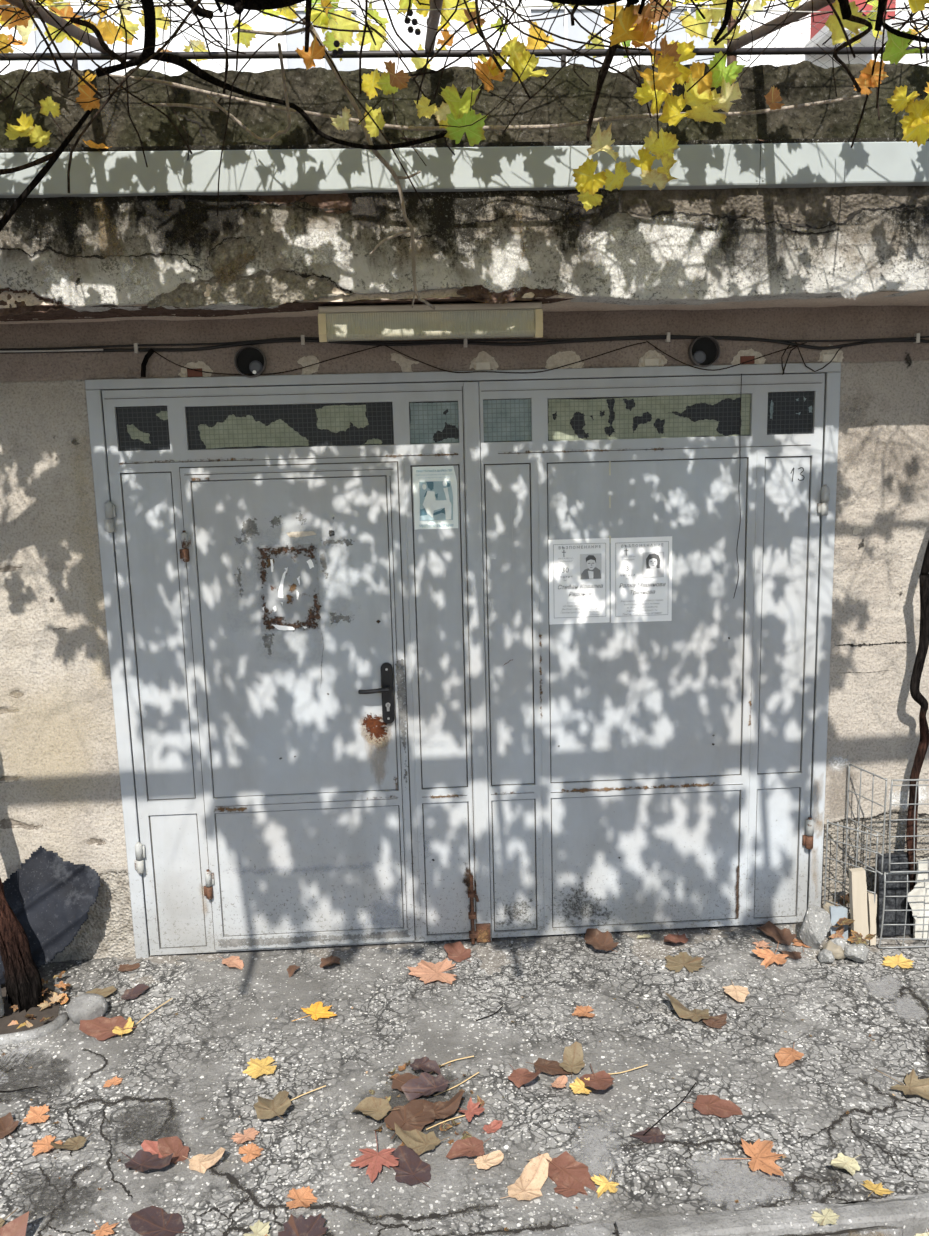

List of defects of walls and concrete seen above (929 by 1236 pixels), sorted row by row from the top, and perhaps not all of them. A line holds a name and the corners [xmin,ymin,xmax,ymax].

leakage [139,195,252,257]
spalling [0,236,573,322]
leakage [281,228,344,266]
leakage [352,192,385,228]
leakage [486,243,530,290]
crack [594,203,929,256]
peeling [198,414,309,449]
peeling [548,394,751,441]
corrosion [362,659,408,799]
corrosion [463,867,476,912]
spalling [821,810,929,939]
crack [780,1225,903,1236]